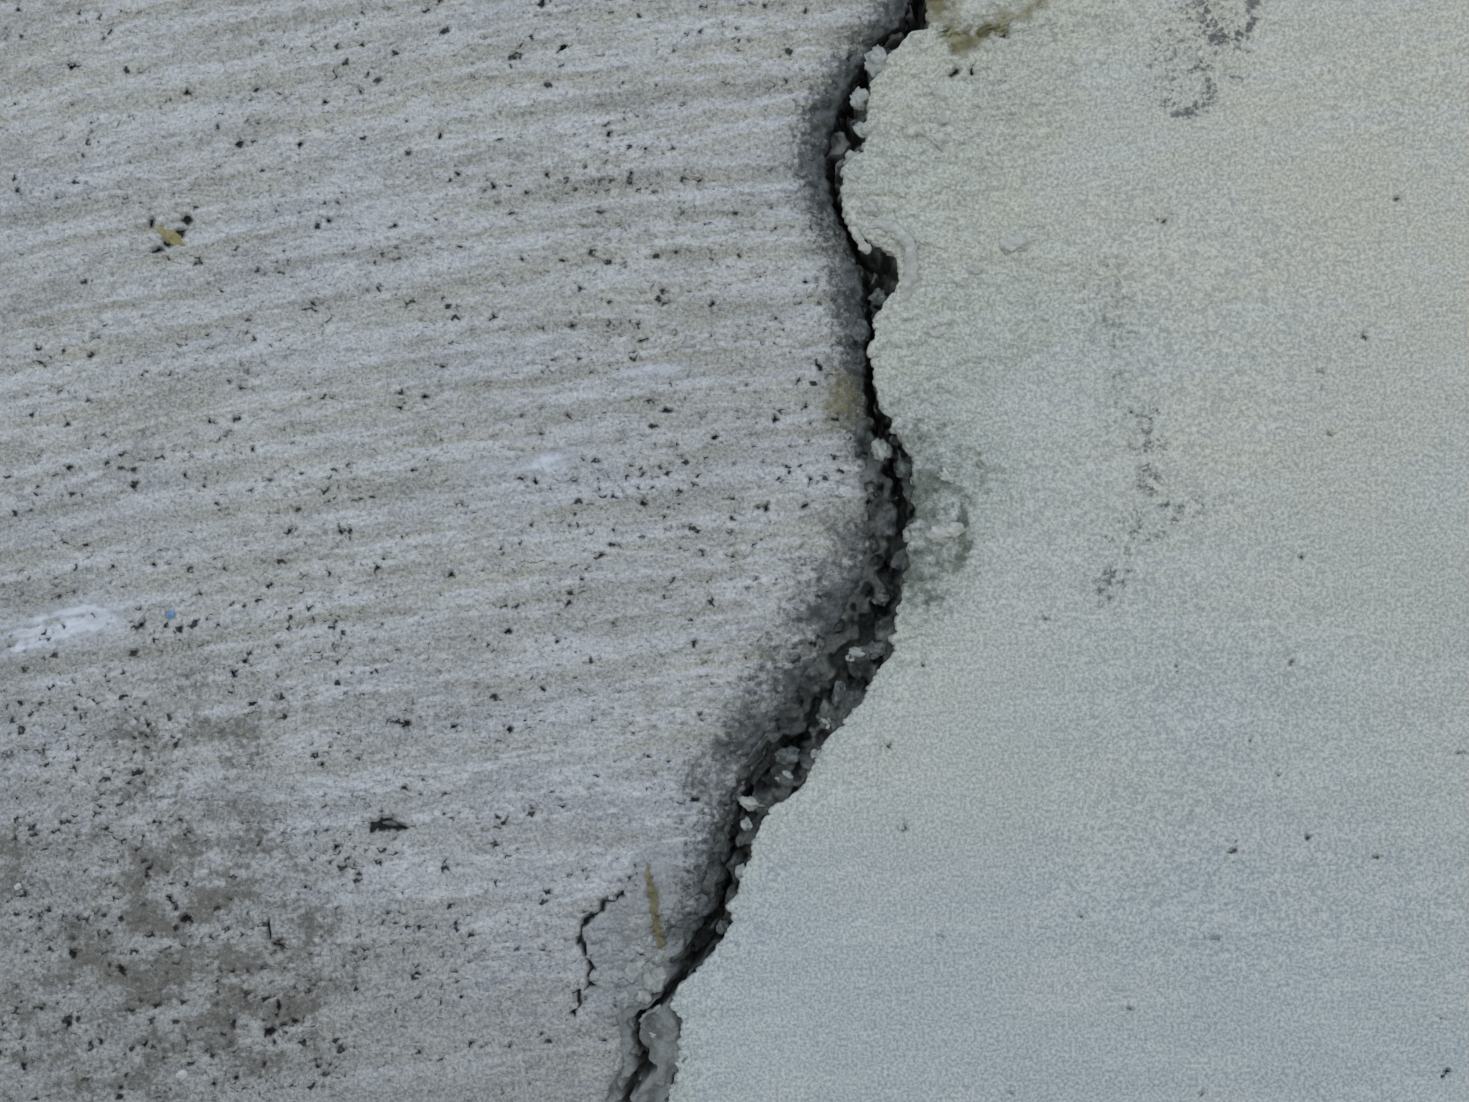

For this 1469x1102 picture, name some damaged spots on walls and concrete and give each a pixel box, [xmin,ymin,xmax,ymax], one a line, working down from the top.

crack [571,864,635,1015]
crack [607,0,930,1102]